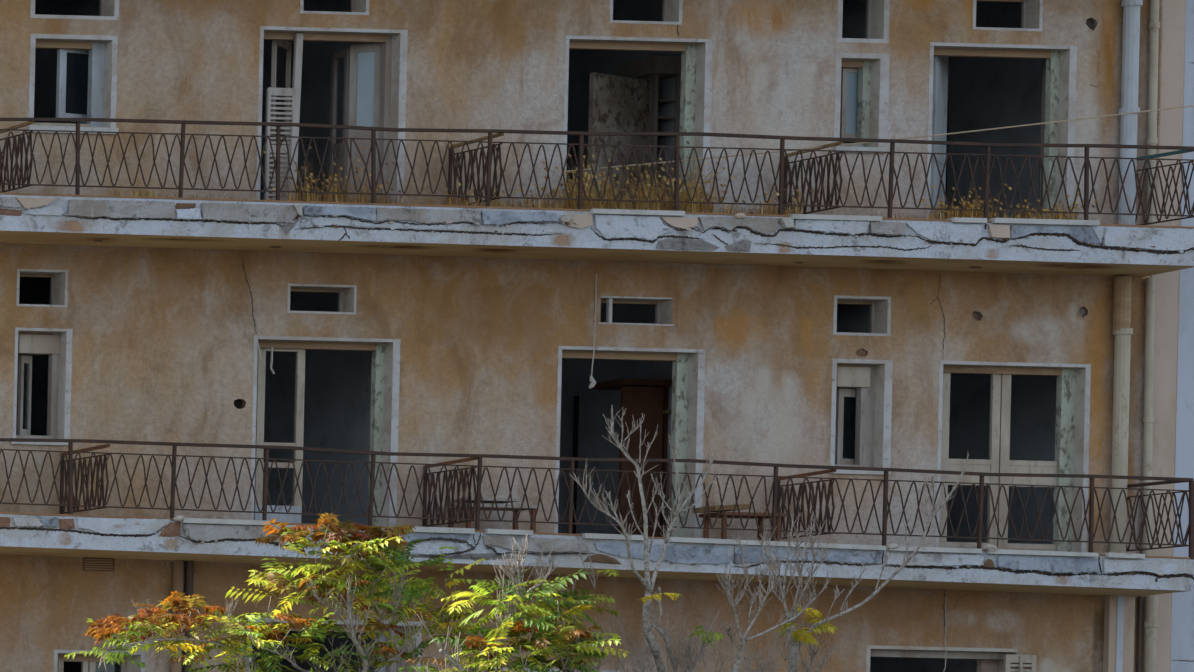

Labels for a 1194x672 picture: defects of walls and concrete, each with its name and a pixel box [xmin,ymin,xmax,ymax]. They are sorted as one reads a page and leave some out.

crack [70,215,562,241]
flaking render [0,197,1194,253]
crack [591,221,1194,255]
crack [242,258,257,333]
crack [931,277,945,360]
crack [0,525,289,546]
crack [734,551,1194,641]